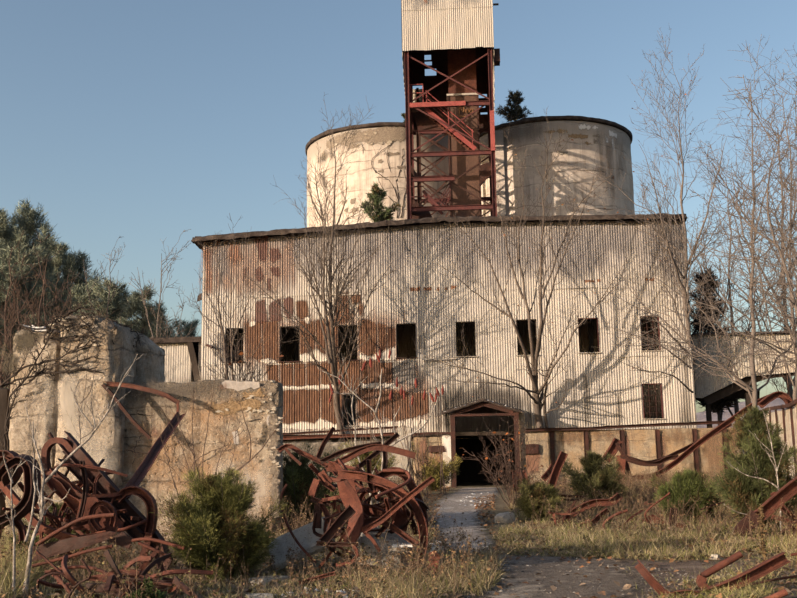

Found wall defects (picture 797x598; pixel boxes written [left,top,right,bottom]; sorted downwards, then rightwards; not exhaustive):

leakage [441,223,542,281]
leakage [552,225,600,276]
peeling [300,348,327,363]
rust [203,236,445,426]
spalling [210,380,338,518]
peeling [359,418,426,428]
leakage [560,407,612,444]
leakage [704,427,742,477]